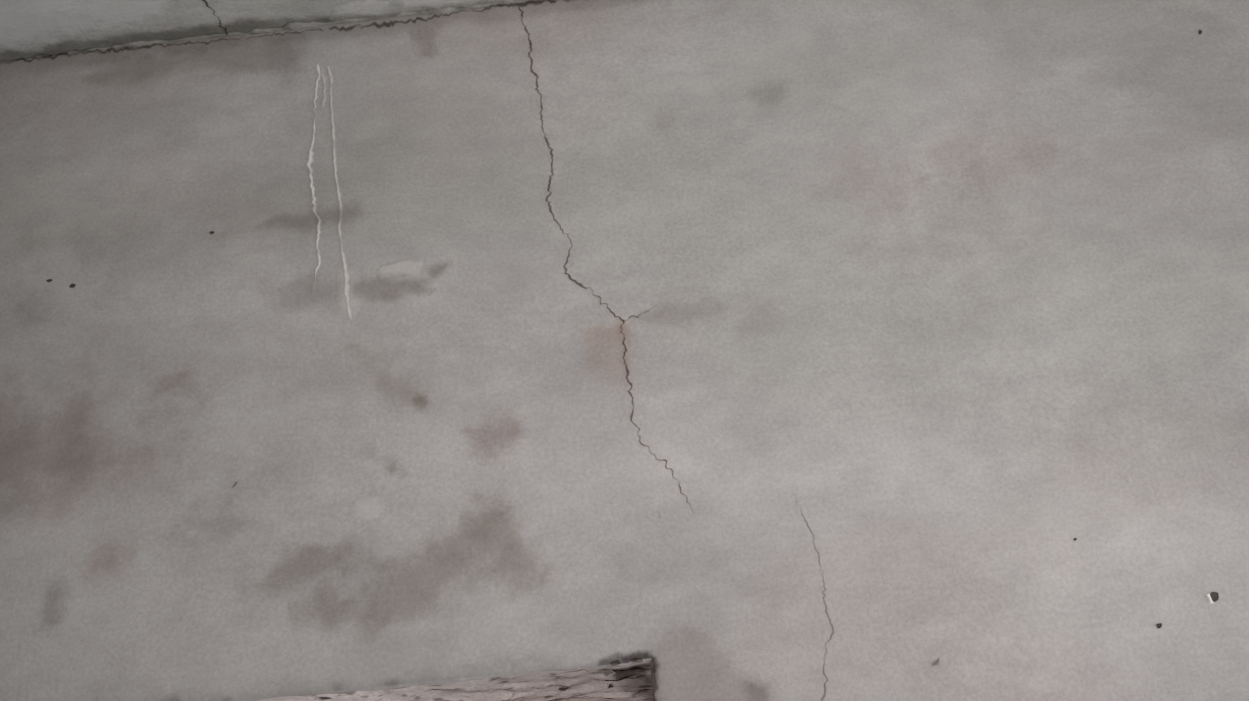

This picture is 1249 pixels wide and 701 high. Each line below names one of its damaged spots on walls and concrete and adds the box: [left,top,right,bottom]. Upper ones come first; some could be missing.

crack [498,0,684,495]